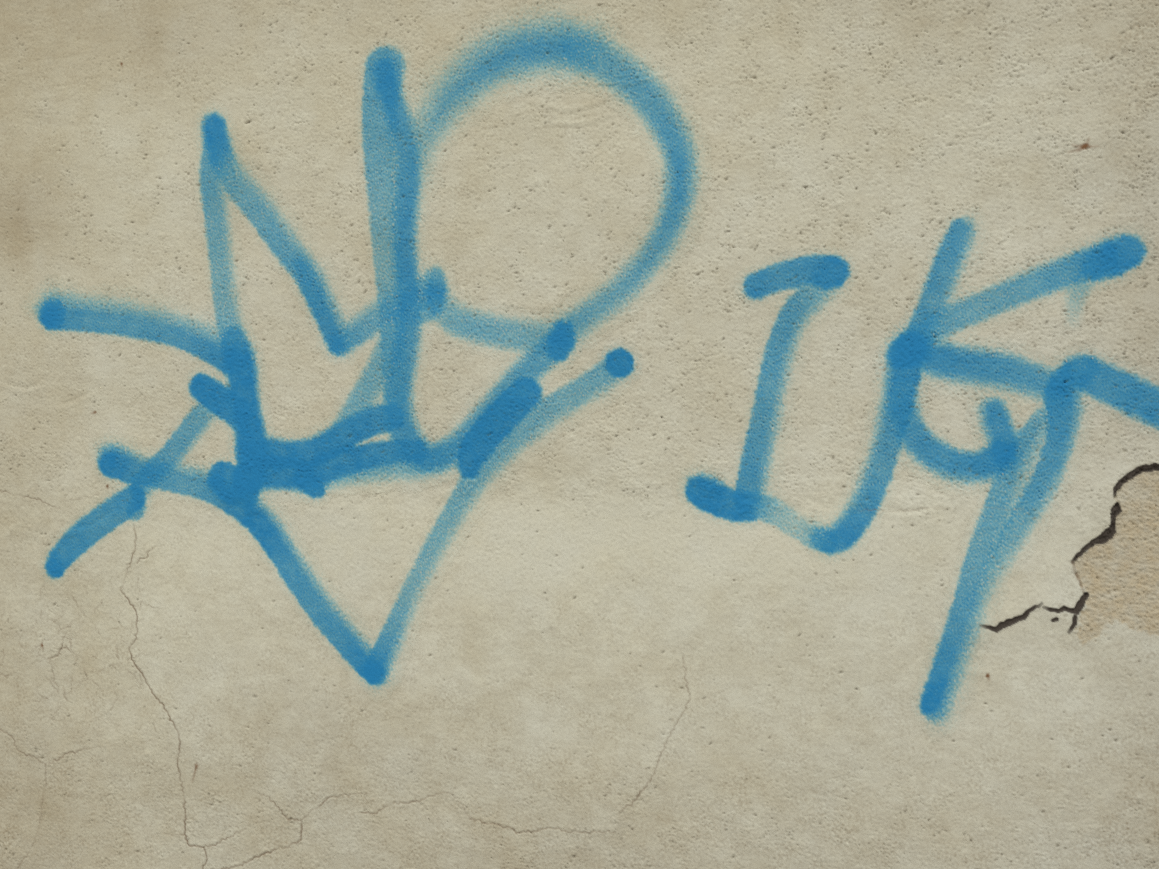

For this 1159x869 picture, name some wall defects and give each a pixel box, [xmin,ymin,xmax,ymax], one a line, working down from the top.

crack [0,523,691,869]
flaking render [1073,473,1159,649]